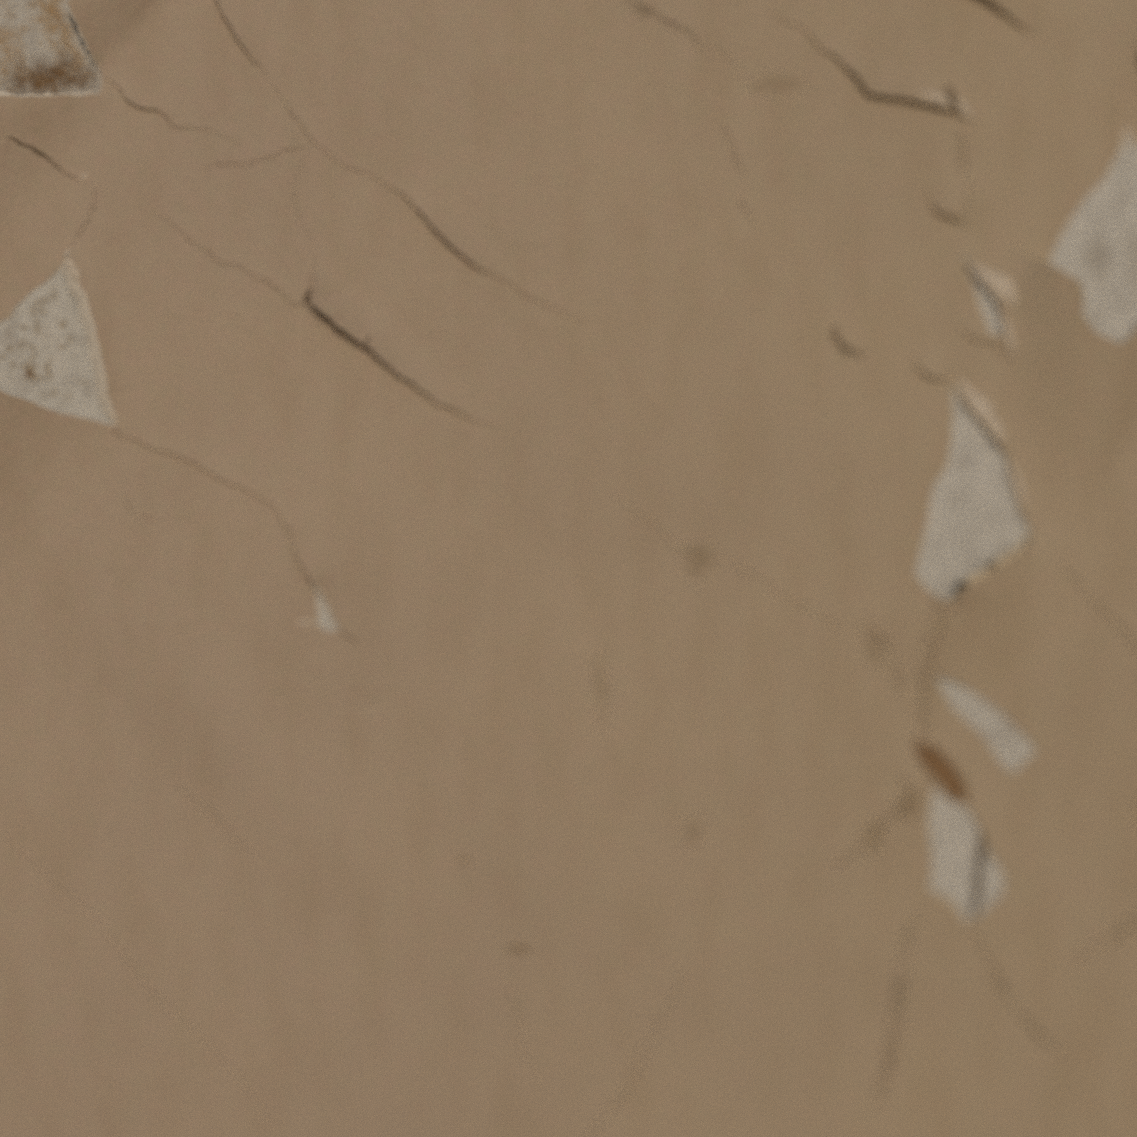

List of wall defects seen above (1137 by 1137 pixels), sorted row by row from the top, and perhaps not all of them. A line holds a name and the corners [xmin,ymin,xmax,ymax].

peeling [0,0,169,240]
peeling [771,8,980,121]
peeling [0,236,142,585]
peeling [961,245,1016,356]
peeling [872,377,1082,773]
peeling [928,777,1012,923]